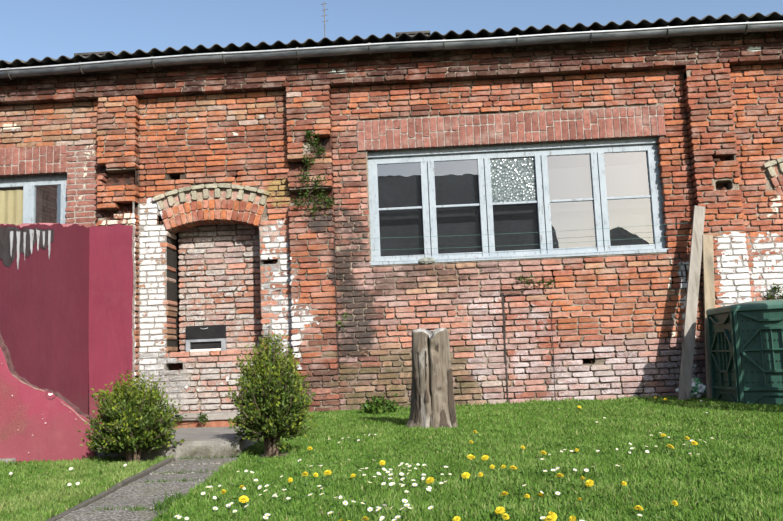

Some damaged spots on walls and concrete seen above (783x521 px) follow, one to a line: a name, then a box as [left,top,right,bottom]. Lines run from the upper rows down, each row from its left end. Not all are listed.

peeling [94,198,253,412]
peeling [178,221,320,353]
peeling [715,231,783,307]